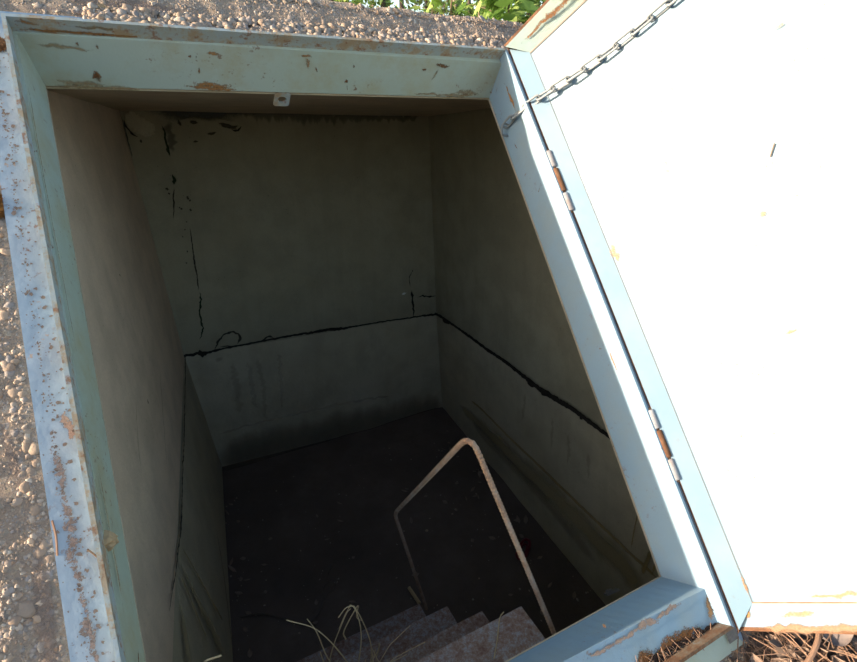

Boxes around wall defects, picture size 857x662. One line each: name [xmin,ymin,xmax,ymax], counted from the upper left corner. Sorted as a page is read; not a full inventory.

rust [16,19,137,51]
rust [527,0,568,38]
rust [187,82,236,91]
crack [162,127,610,439]
crack [169,405,185,611]
rust [812,591,857,599]
rust [638,594,717,662]
rust [764,611,857,634]